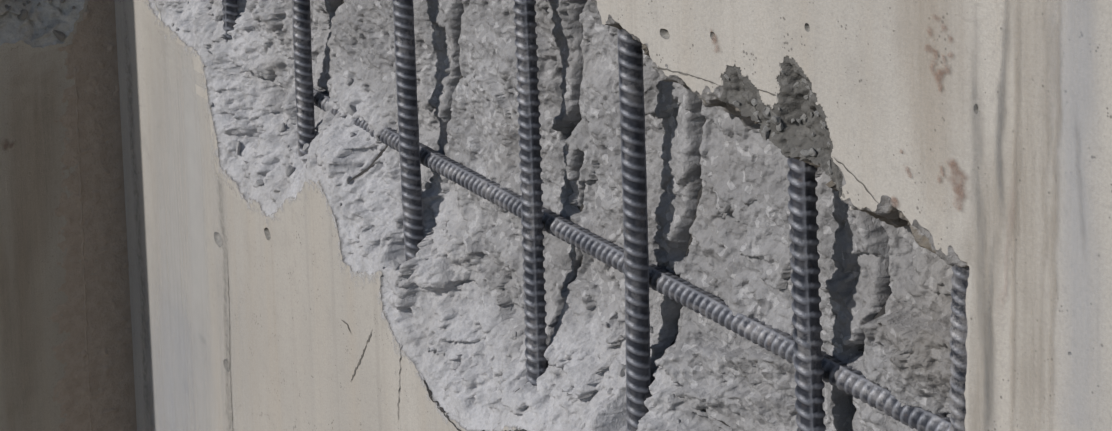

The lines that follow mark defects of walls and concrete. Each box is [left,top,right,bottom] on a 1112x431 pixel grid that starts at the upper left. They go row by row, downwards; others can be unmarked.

spalling [0,0,85,48]
spalling [148,0,970,431]